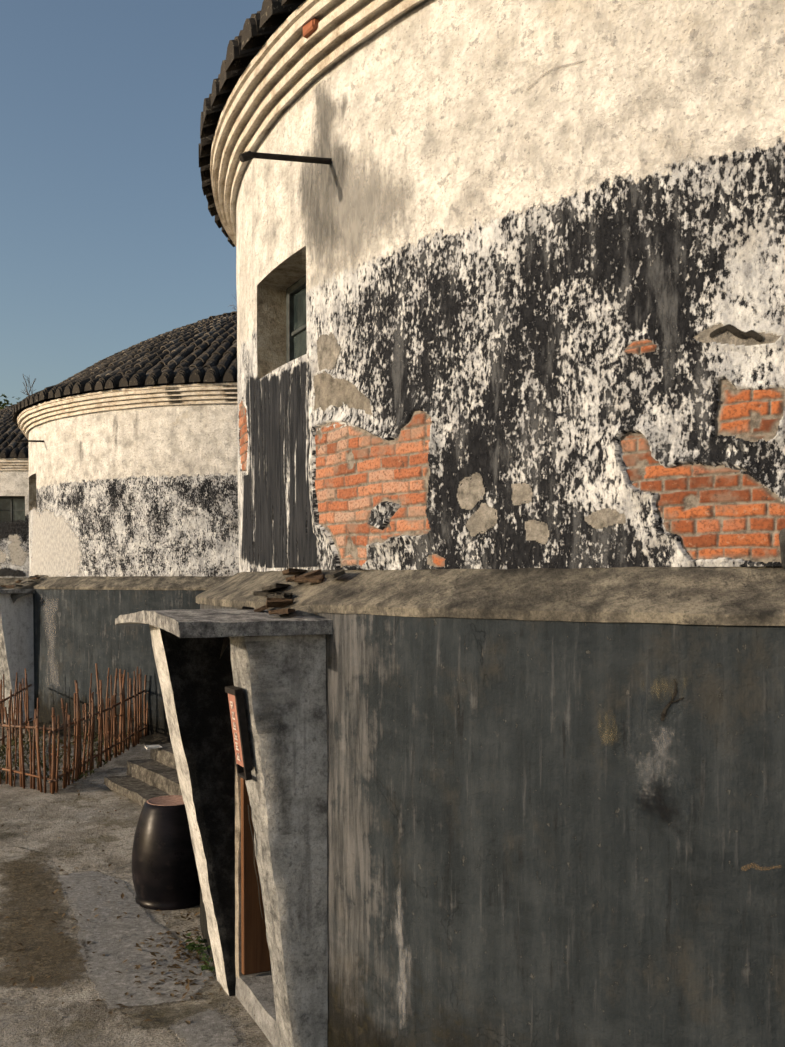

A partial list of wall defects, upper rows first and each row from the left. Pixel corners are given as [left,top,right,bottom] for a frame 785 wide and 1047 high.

leakage [300,86,402,268]
leakage [0,568,26,577]
flaking render [0,534,27,566]
leakage [0,519,29,539]
flaking render [305,332,498,570]
flaking render [577,312,785,567]